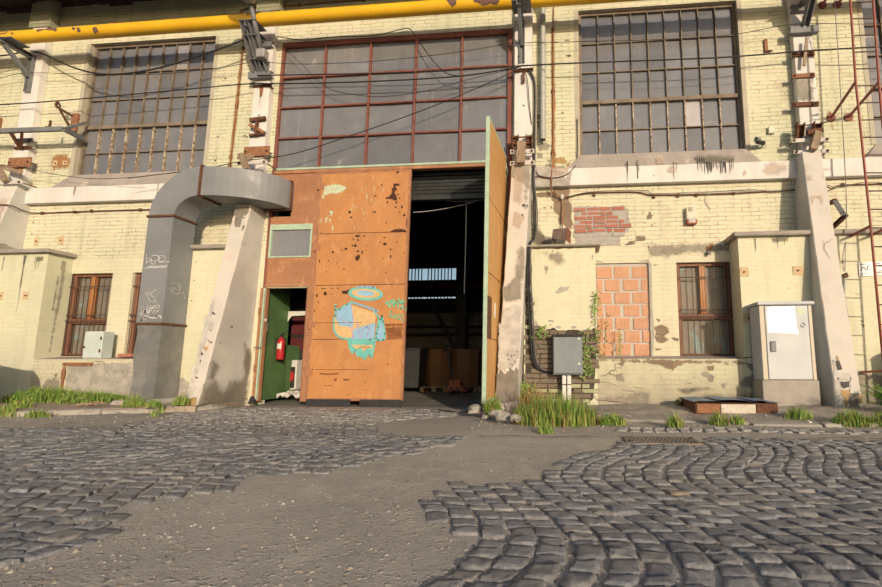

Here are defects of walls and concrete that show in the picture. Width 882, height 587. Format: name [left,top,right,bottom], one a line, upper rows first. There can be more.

rust [374,171,407,259]
peeling [535,143,573,229]
water stain [697,155,734,174]
flaking render [496,260,606,405]
peeling [618,259,744,371]